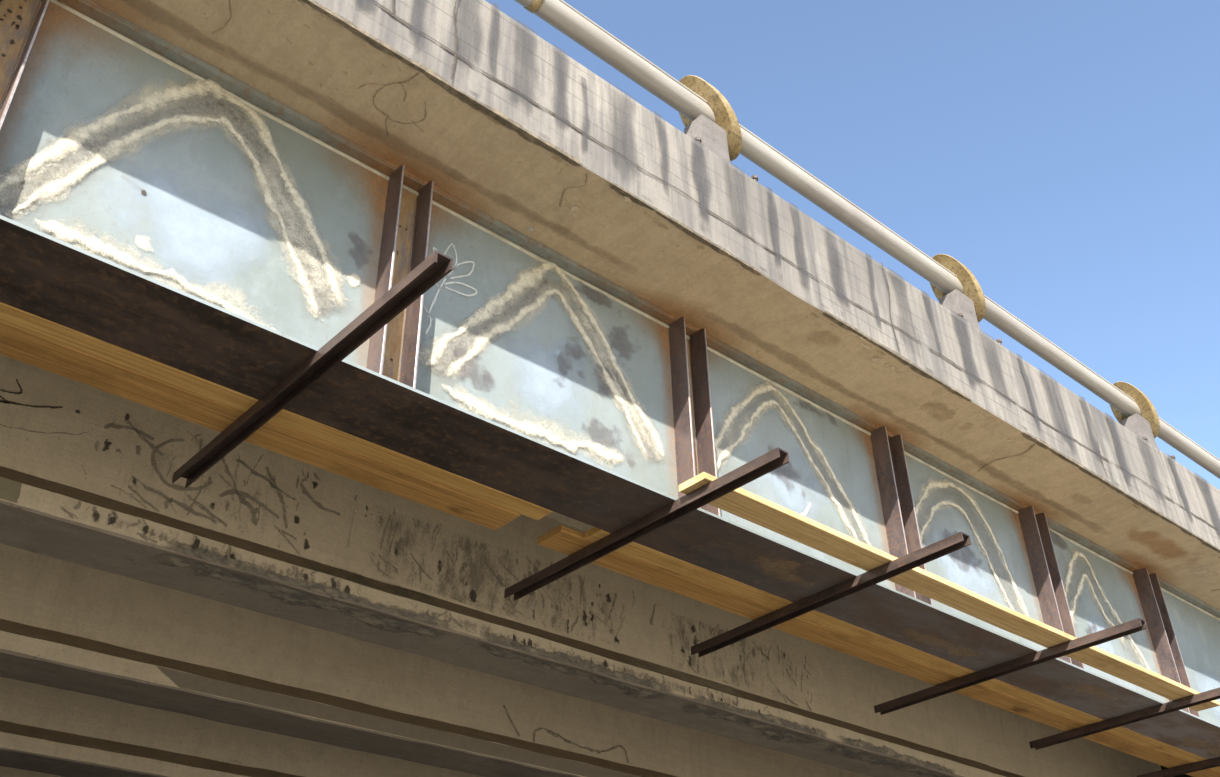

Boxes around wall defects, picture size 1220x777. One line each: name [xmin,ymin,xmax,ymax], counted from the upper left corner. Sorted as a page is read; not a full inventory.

rust [0,0,78,103]
leakage [410,0,424,41]
leakage [489,2,498,73]
crack [359,73,426,135]
leakage [558,58,567,122]
leakage [655,112,667,184]
leakage [693,138,708,217]
leakage [768,187,781,261]
crack [373,0,1216,529]
leakage [793,206,807,281]
leakage [828,230,847,302]
spalling [61,455,954,777]